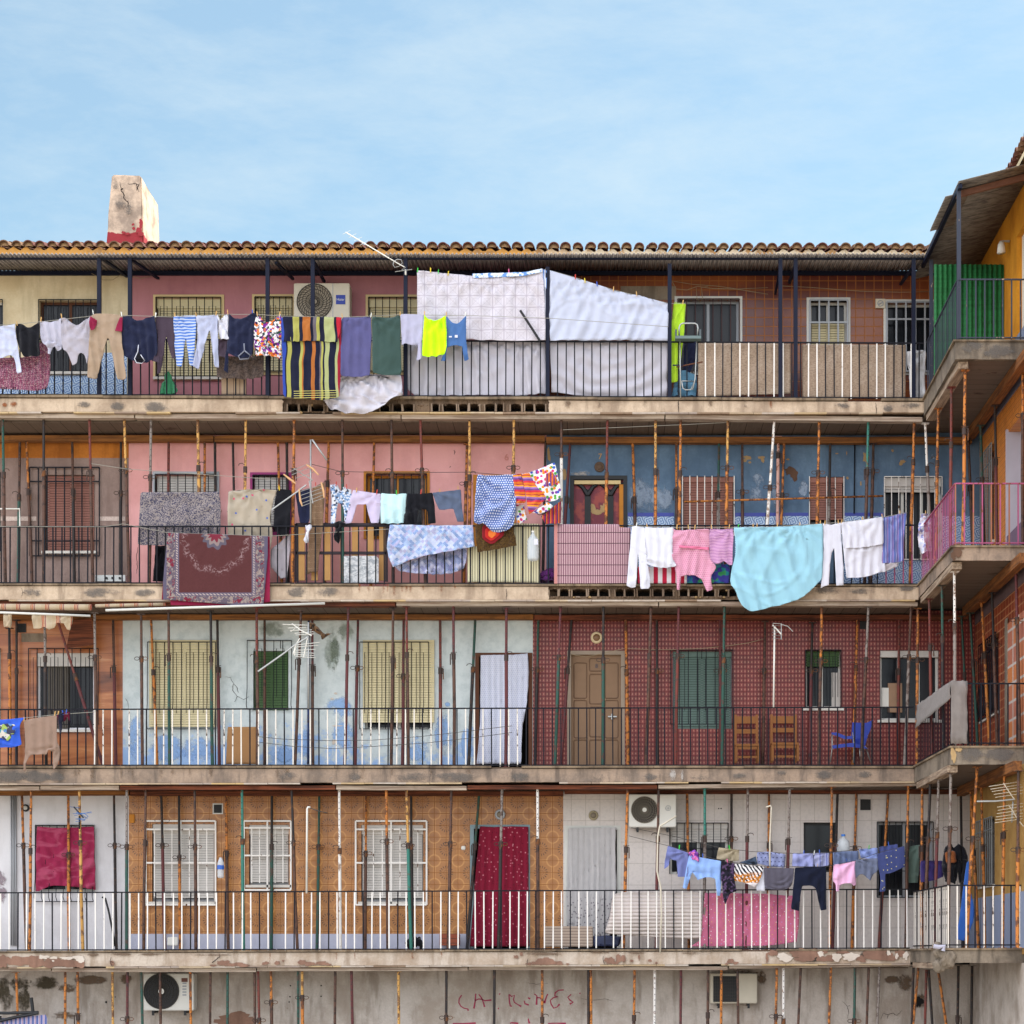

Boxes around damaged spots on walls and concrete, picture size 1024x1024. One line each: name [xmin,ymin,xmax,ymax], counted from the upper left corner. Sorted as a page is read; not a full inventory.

flaking render [784,458,808,496]
peeling [0,955,85,968]
peeling [766,948,909,963]